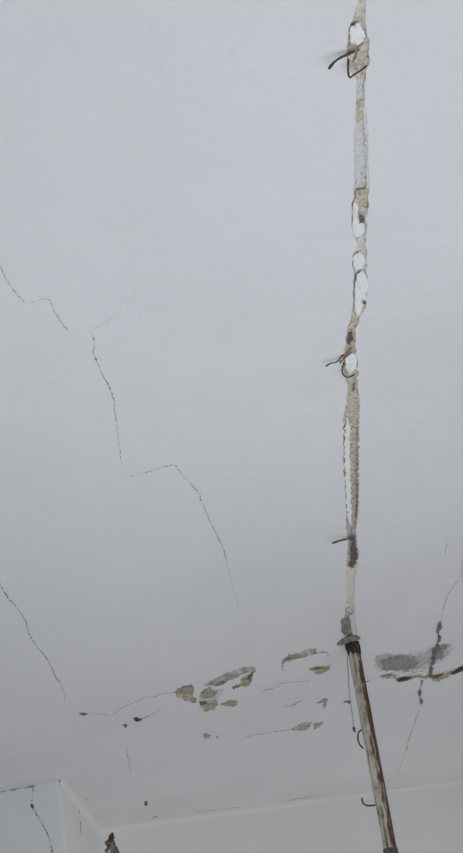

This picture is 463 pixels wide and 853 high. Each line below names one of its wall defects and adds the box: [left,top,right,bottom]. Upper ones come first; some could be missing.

flaking render [349,22,365,45]
flaking render [352,202,365,238]
flaking render [353,252,368,317]
flaking render [345,352,358,374]
flaking render [343,417,352,526]
flaking render [281,648,327,671]
crack [400,547,462,767]
flaking render [304,665,332,682]
flaking render [381,667,463,682]
flaking render [175,666,256,712]
flaking render [291,722,323,731]